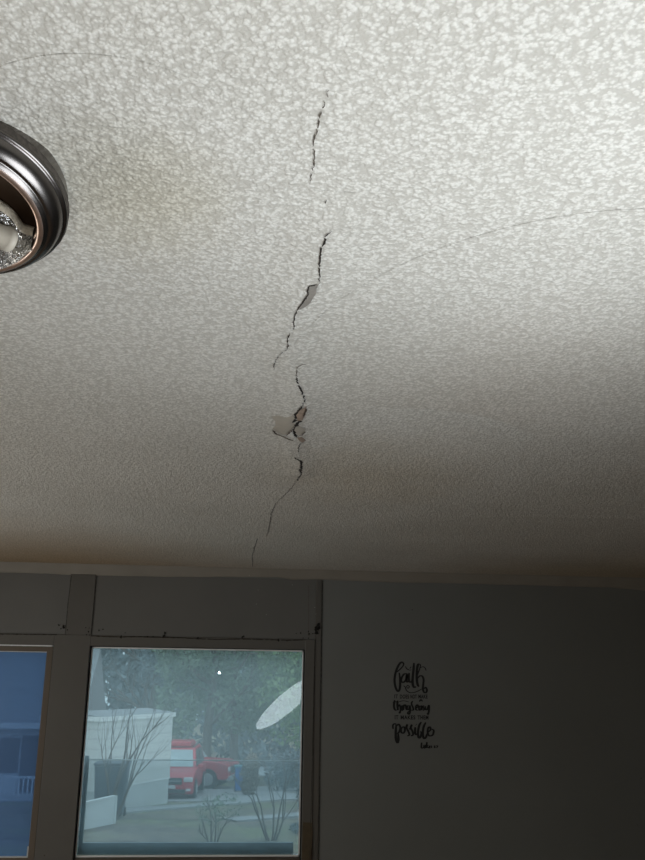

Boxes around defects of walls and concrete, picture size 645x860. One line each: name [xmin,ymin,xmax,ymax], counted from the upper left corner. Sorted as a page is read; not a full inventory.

crack [310,90,329,182]
crack [318,232,331,282]
spalling [297,284,319,310]
crack [252,311,306,565]
peeling [272,407,307,443]